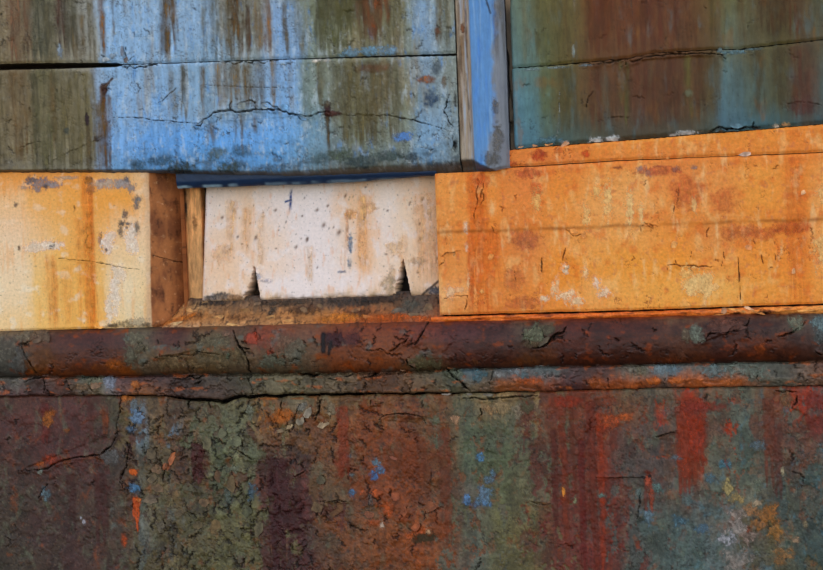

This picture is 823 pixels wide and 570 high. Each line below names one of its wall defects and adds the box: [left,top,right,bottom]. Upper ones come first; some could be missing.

crack [589,53,725,65]
crack [113,86,321,126]
damp [313,62,421,169]
damp [132,157,195,174]
damp [213,148,247,173]
corrosion [321,332,360,355]
peeling [682,306,771,344]
peeling [788,307,823,345]
corrosion [646,376,684,385]
peeling [259,397,312,433]
crack [29,400,129,499]
corrosion [675,397,720,494]